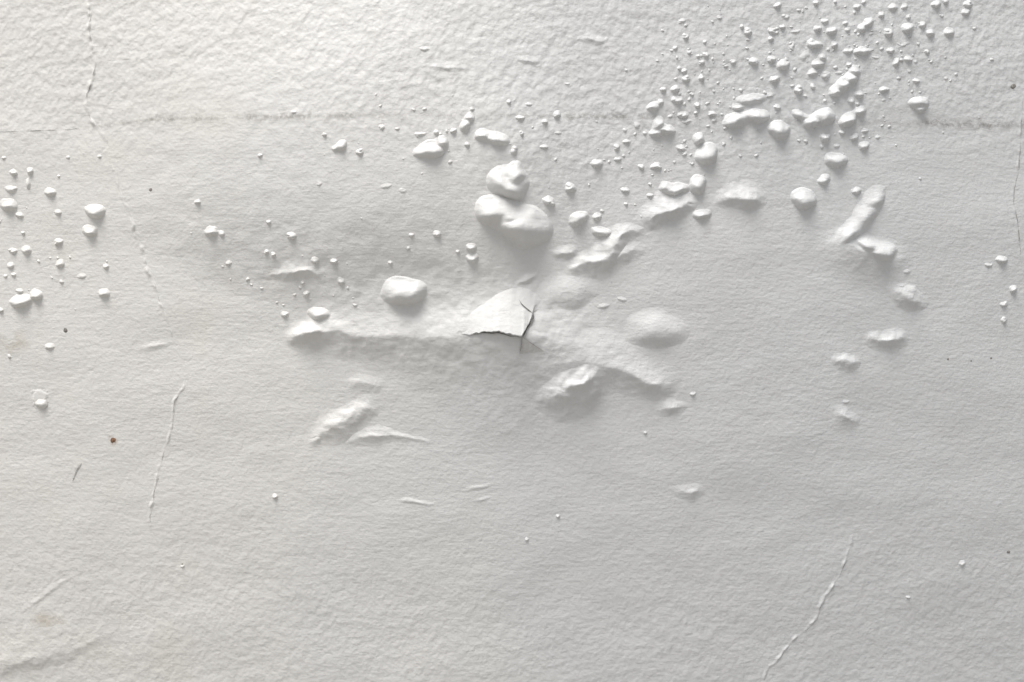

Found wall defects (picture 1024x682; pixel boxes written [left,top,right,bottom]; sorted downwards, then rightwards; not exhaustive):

crack [147,377,186,533]
crack [761,534,854,682]